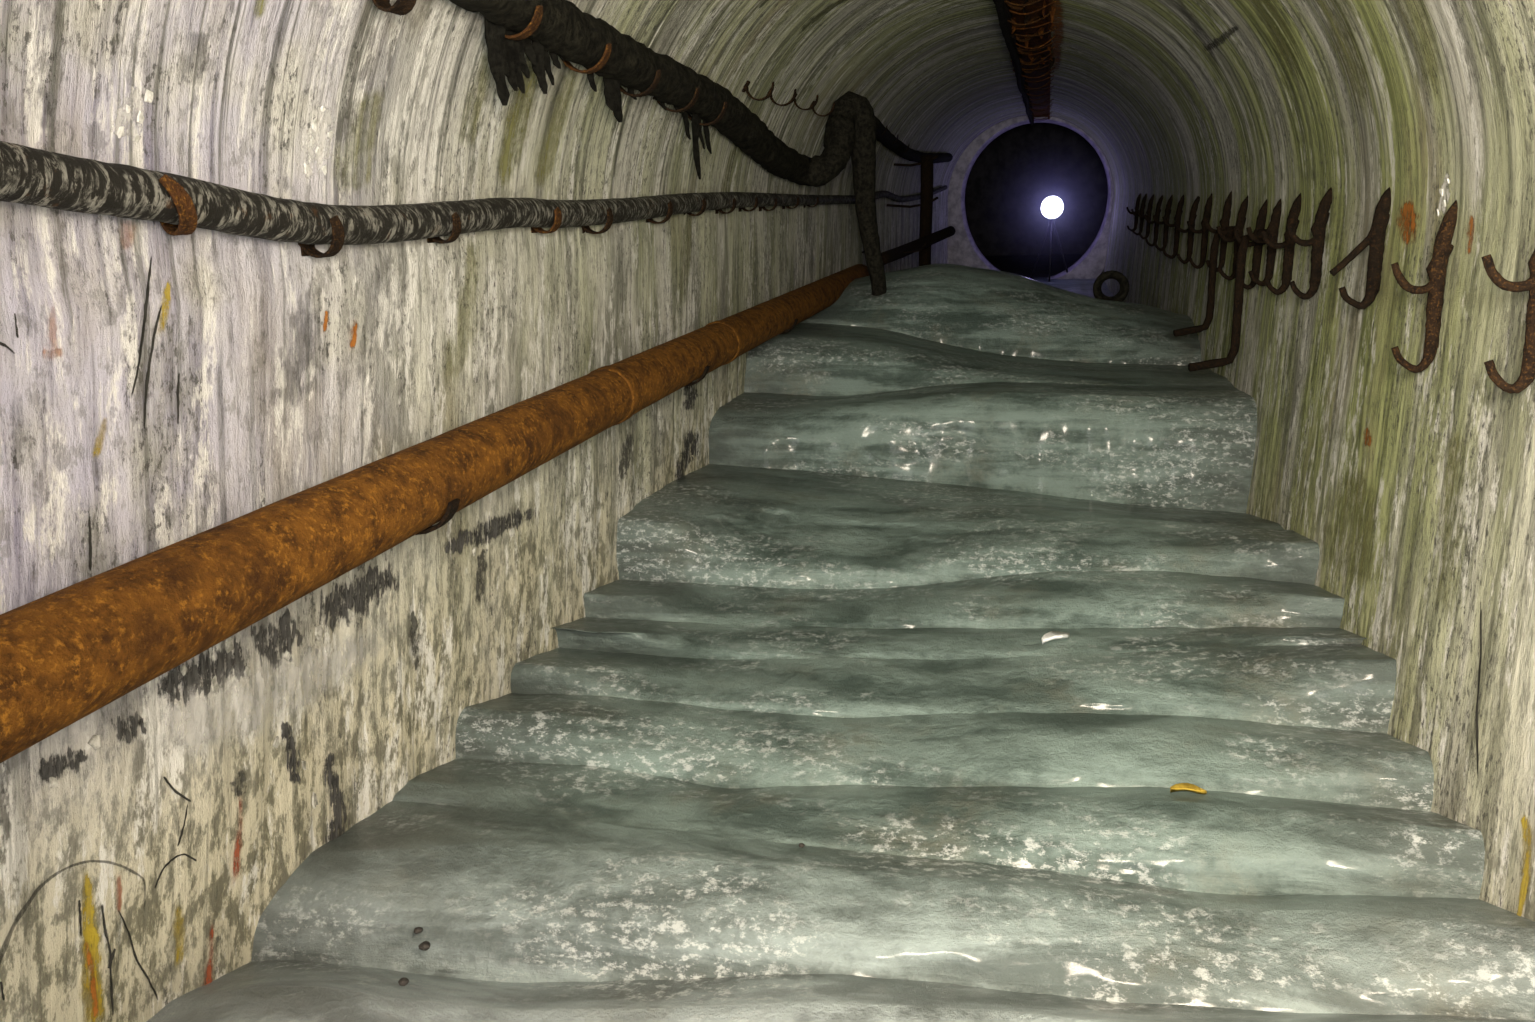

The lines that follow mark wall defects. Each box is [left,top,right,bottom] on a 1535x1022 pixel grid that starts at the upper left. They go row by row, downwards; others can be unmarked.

rust [1398,201,1419,244]
rust [350,323,358,348]
damp [82,874,104,1022]